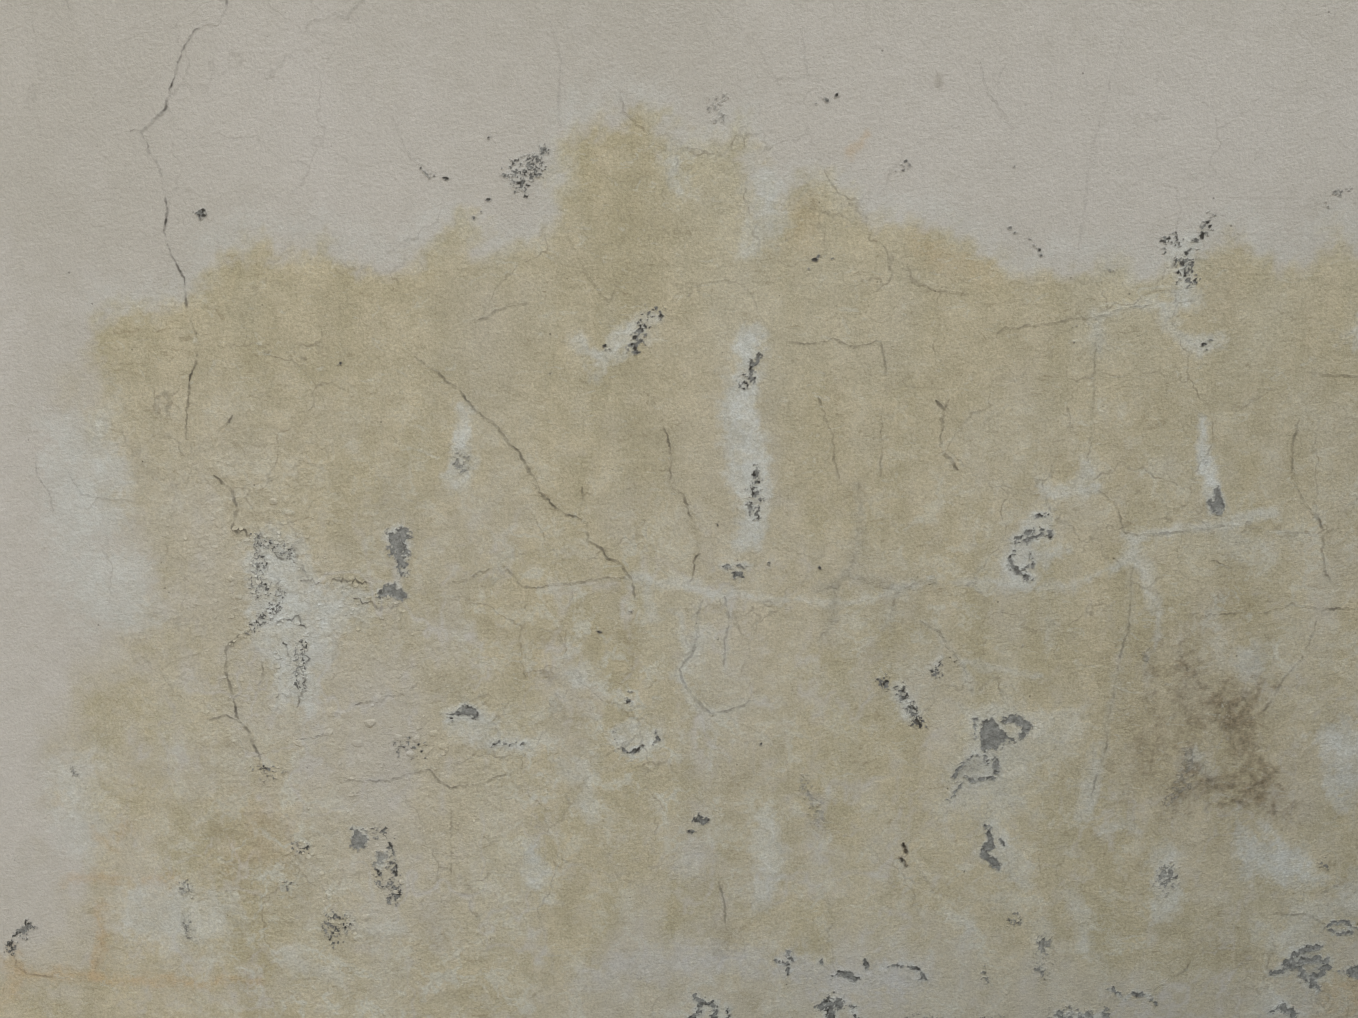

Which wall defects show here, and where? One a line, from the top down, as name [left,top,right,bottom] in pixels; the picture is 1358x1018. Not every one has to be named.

crack [129,0,233,440]
crack [213,474,242,536]
crack [414,356,637,678]
peeling [223,519,418,713]
peeling [874,673,929,729]
spalling [938,703,1044,811]
damp [1322,735,1335,756]
spalling [346,824,403,907]
damp [1268,837,1289,870]
damp [0,979,272,1018]
damp [702,971,817,1018]
spalling [1260,915,1358,1018]